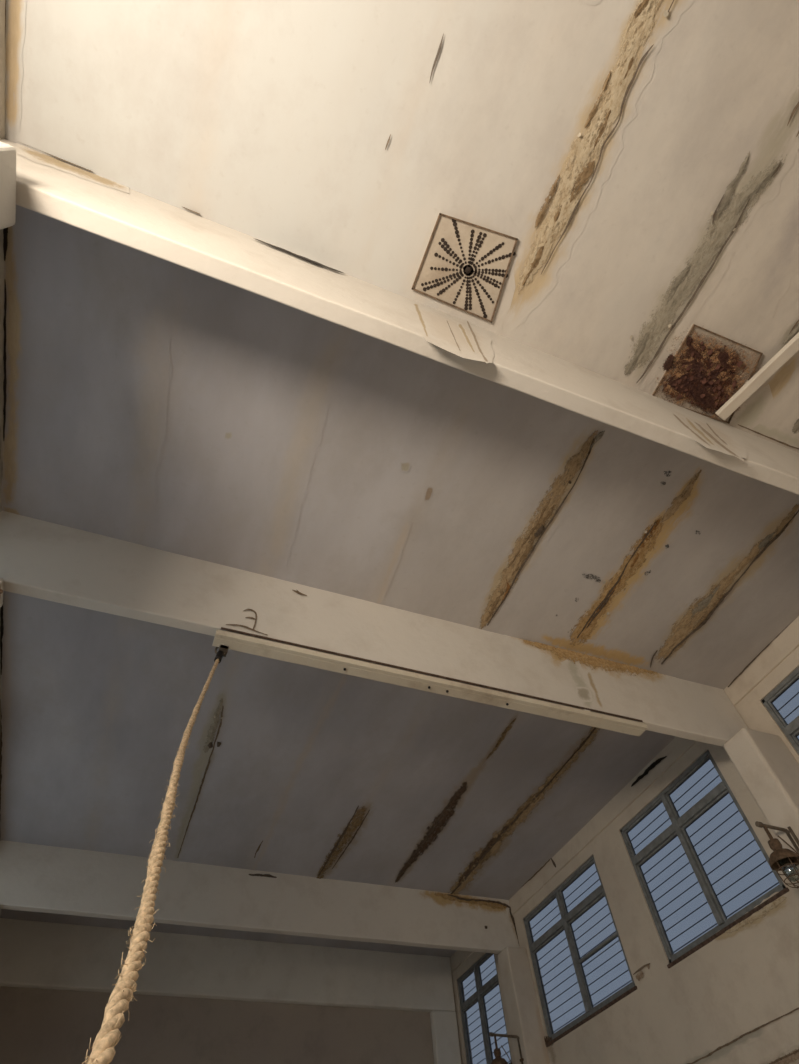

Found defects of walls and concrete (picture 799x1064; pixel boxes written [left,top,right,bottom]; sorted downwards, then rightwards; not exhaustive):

crack [430,34,444,81]
crack [254,238,343,273]
spalling [503,0,694,328]
spalling [612,71,799,391]
rust [655,331,759,461]
spalling [472,418,613,632]
spalling [503,458,799,711]
spalling [312,796,382,879]
spalling [390,710,524,887]
spalling [417,725,611,929]